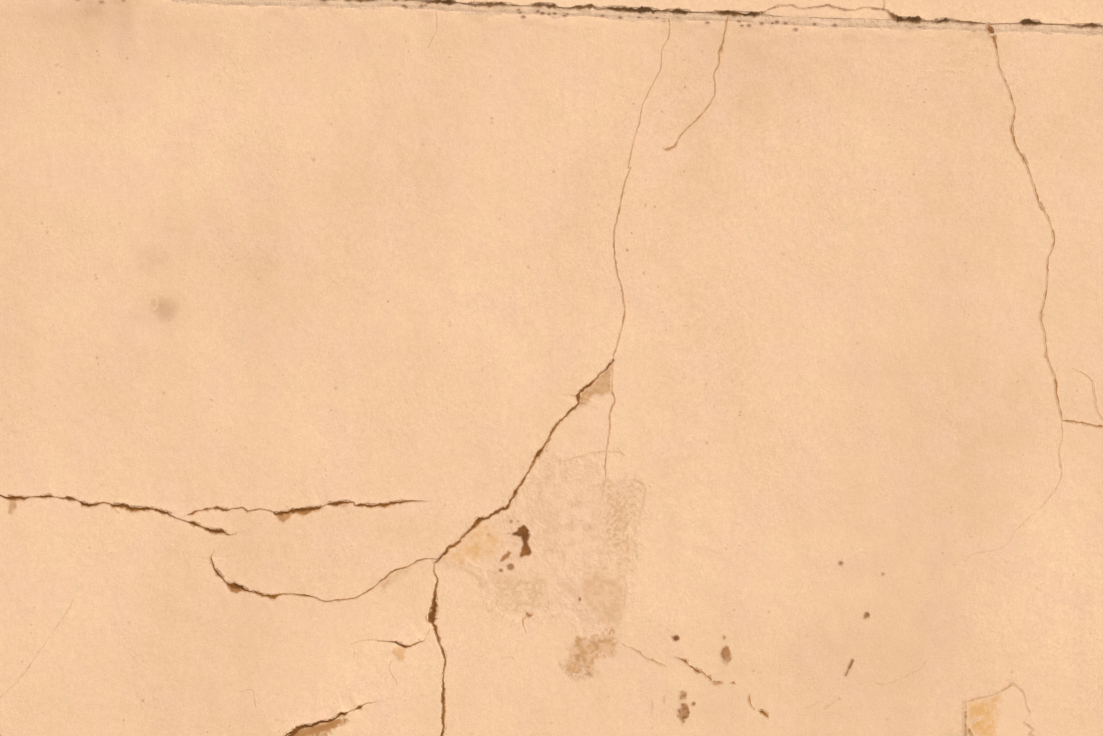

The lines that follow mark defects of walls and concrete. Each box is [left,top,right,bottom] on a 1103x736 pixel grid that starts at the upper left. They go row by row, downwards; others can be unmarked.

crack [0,0,838,736]
peeling [432,438,657,681]
crack [883,0,1103,560]
peeling [962,681,1037,736]